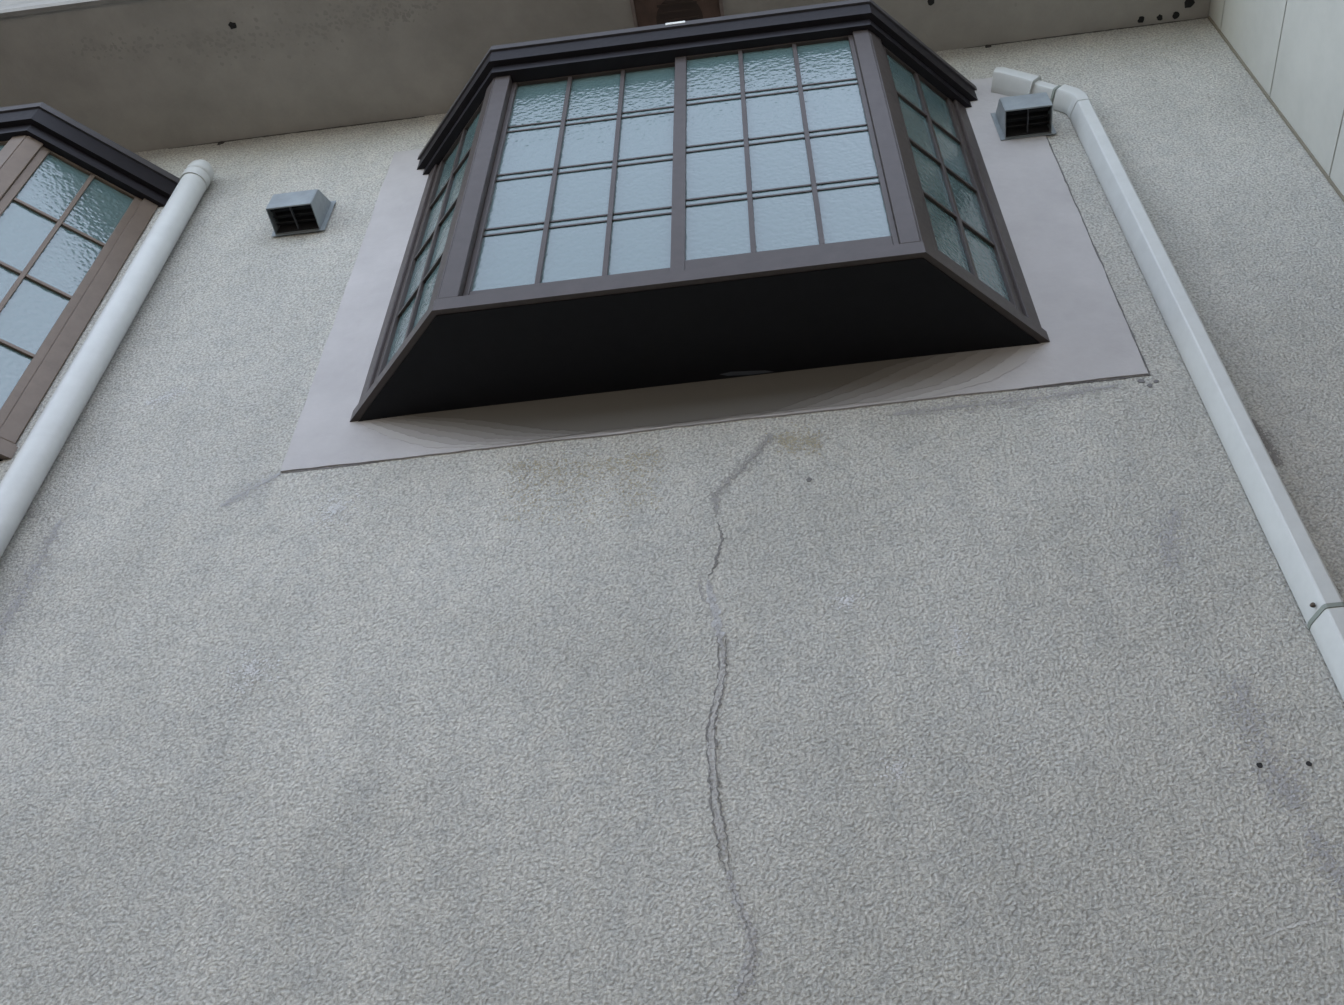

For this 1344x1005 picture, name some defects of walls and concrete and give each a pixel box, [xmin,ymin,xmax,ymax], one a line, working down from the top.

crack [698,437,769,604]
crack [705,637,755,1005]